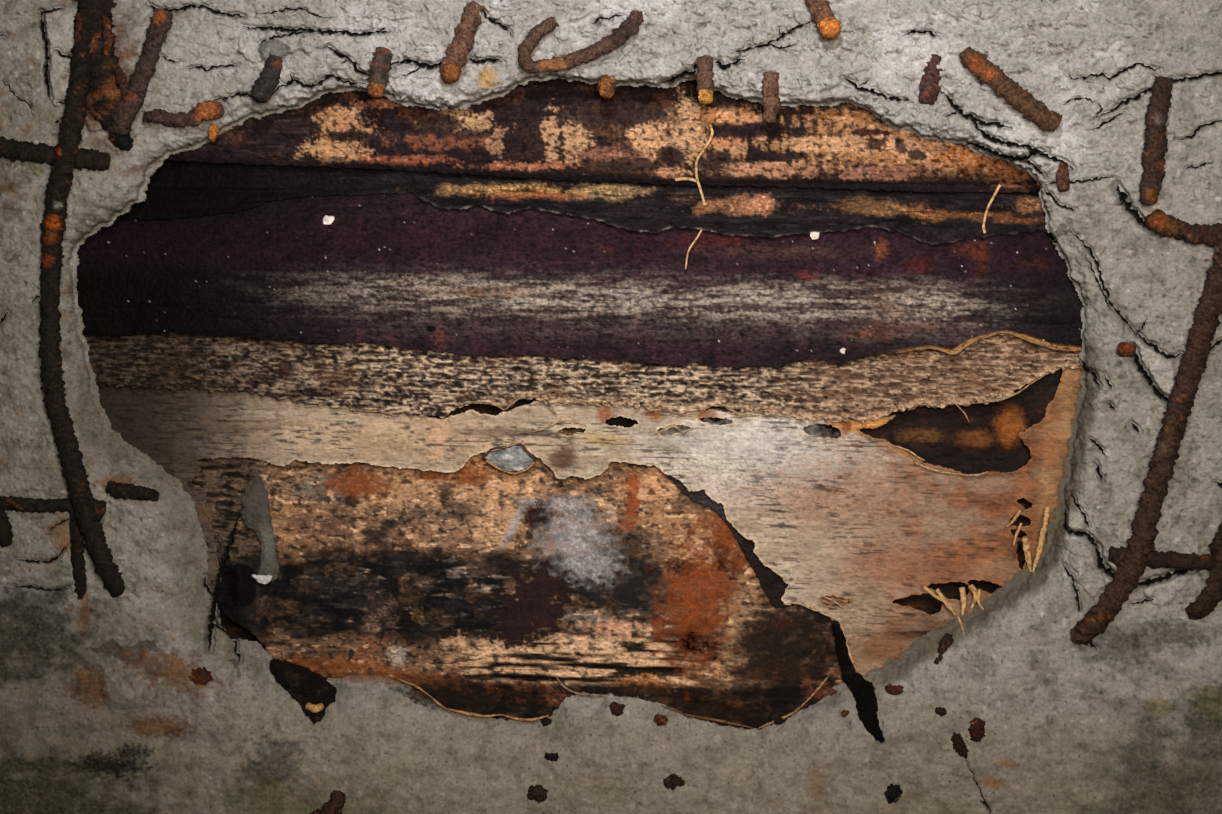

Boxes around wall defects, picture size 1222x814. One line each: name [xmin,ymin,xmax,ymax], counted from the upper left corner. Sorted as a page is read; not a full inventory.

rust [73,0,137,131]
rust [208,123,220,142]
crack [145,1,513,101]
crack [661,20,815,83]
crack [845,78,909,101]
crack [902,29,941,37]
crack [1062,63,1222,130]
crack [1177,120,1222,169]
crack [941,90,1183,402]
spalling [108,0,1222,646]
leakage [264,499,659,649]
crack [1063,489,1193,613]